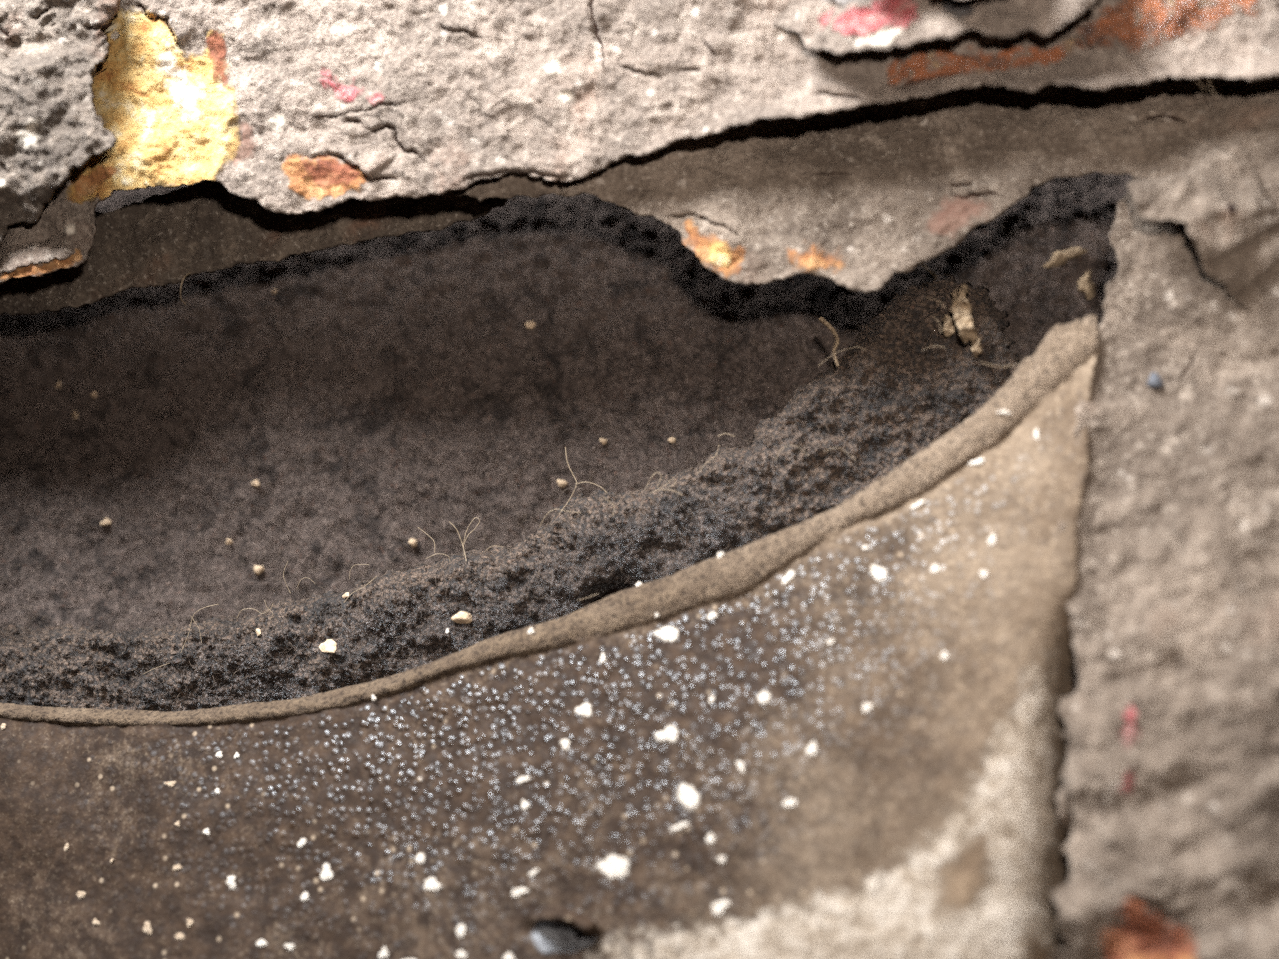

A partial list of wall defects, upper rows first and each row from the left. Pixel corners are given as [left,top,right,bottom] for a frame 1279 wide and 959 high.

corrosion [773,0,1259,85]
crack [814,71,963,101]
corrosion [0,0,240,248]
corrosion [282,138,398,200]
crack [291,99,425,182]
crack [454,170,579,185]
crack [949,182,1000,199]
crack [1135,114,1189,123]
crack [663,214,738,235]
corrosion [0,249,82,279]
damp [945,834,986,909]
corrosion [1098,896,1196,959]